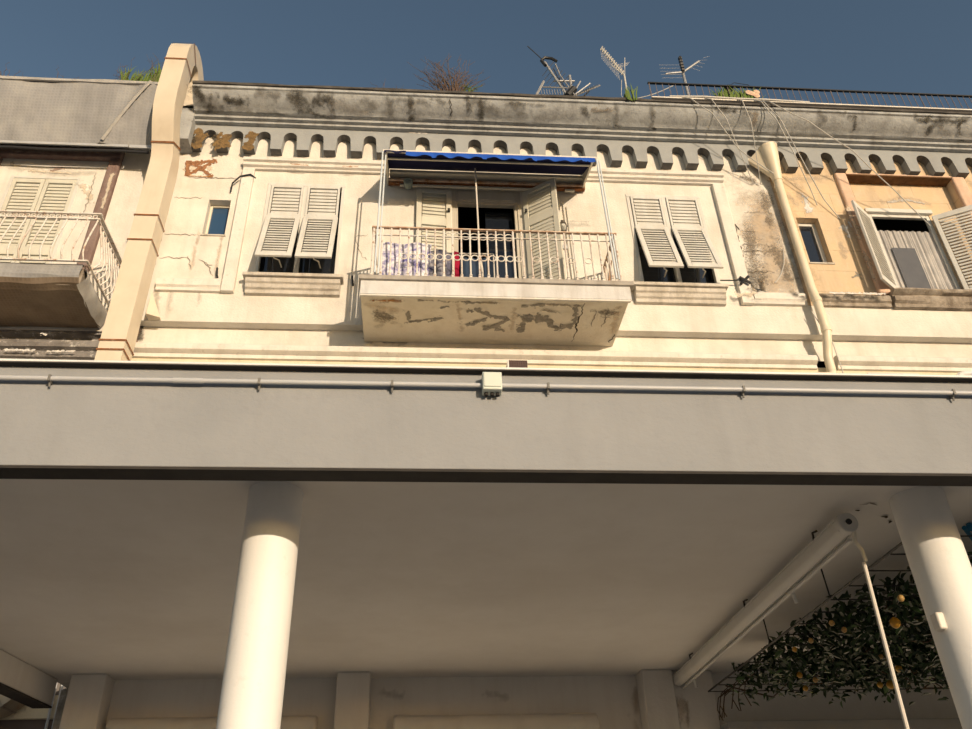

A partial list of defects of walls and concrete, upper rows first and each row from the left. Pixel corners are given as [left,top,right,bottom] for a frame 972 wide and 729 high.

leakage [193,85,278,114]
leakage [288,92,335,117]
leakage [918,115,967,141]
spalling [183,128,259,177]
leakage [742,176,806,298]
crack [164,234,212,275]
leakage [821,292,886,301]
spalling [405,306,449,323]
spalling [465,301,579,333]
crack [572,305,615,342]